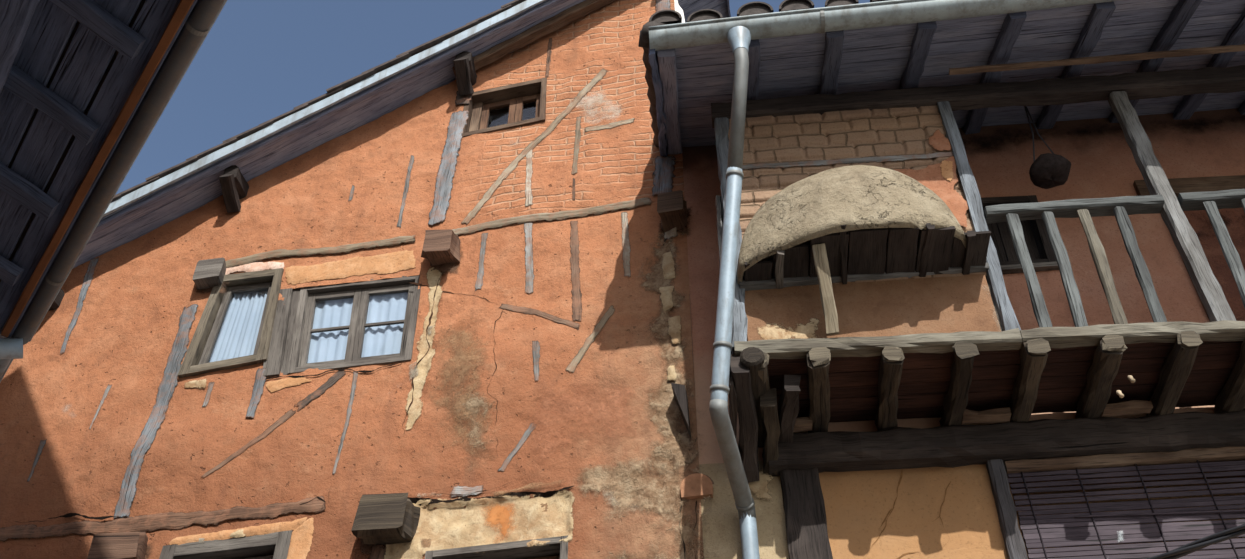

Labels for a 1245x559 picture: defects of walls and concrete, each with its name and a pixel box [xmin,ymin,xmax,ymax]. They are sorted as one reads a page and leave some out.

flaking render [893,130,969,227]
flaking render [225,250,442,432]
crack [407,282,574,506]
flaking render [384,236,701,559]
flaking render [758,318,819,340]
crack [873,470,951,559]